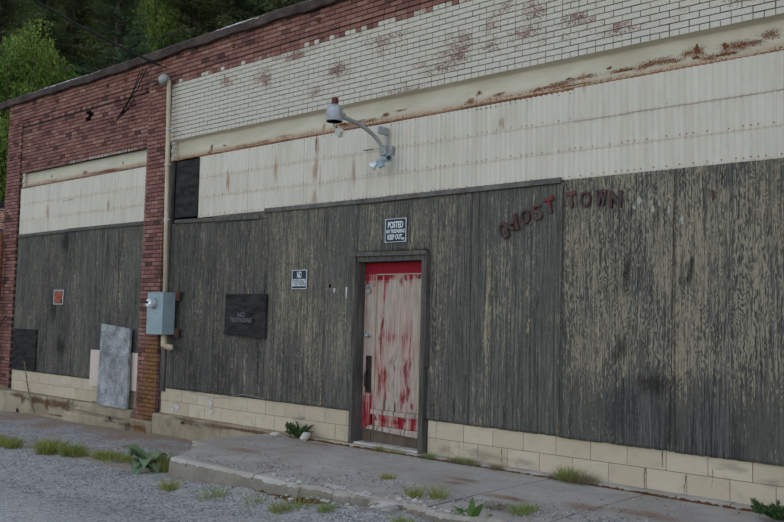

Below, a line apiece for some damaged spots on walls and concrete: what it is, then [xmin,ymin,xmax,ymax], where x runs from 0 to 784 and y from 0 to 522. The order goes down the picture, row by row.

rust [464,28,779,111]
peeling [378,356,413,412]